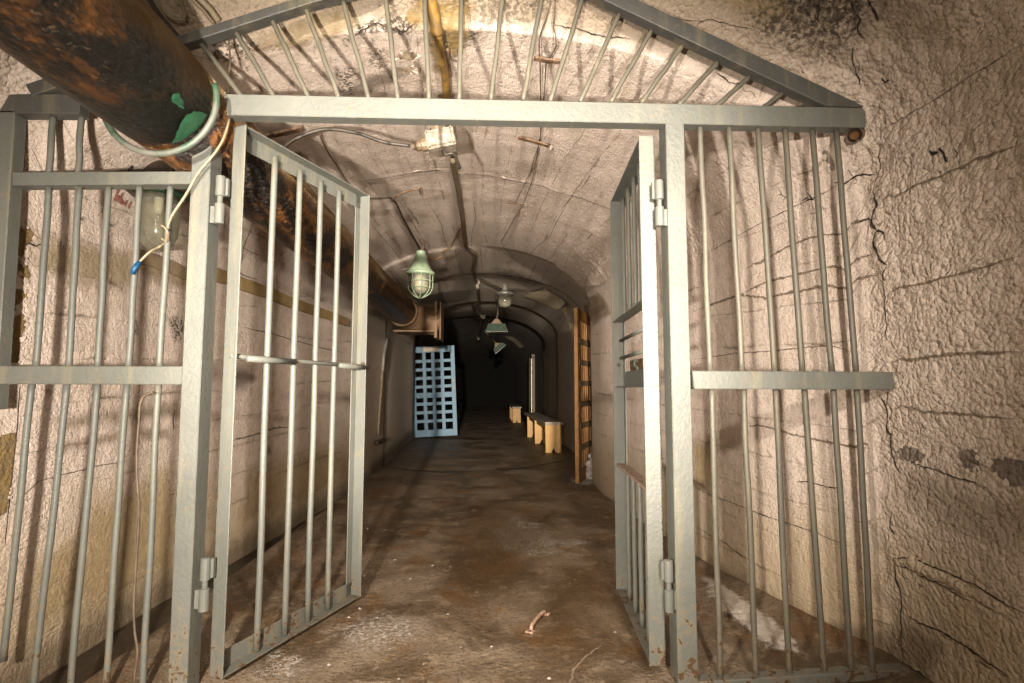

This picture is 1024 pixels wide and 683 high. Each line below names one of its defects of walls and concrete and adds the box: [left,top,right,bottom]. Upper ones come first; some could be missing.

crack [929,148,958,162]
crack [484,175,609,278]
spalling [895,445,924,464]
spalling [959,447,1024,487]
crack [889,512,1007,678]